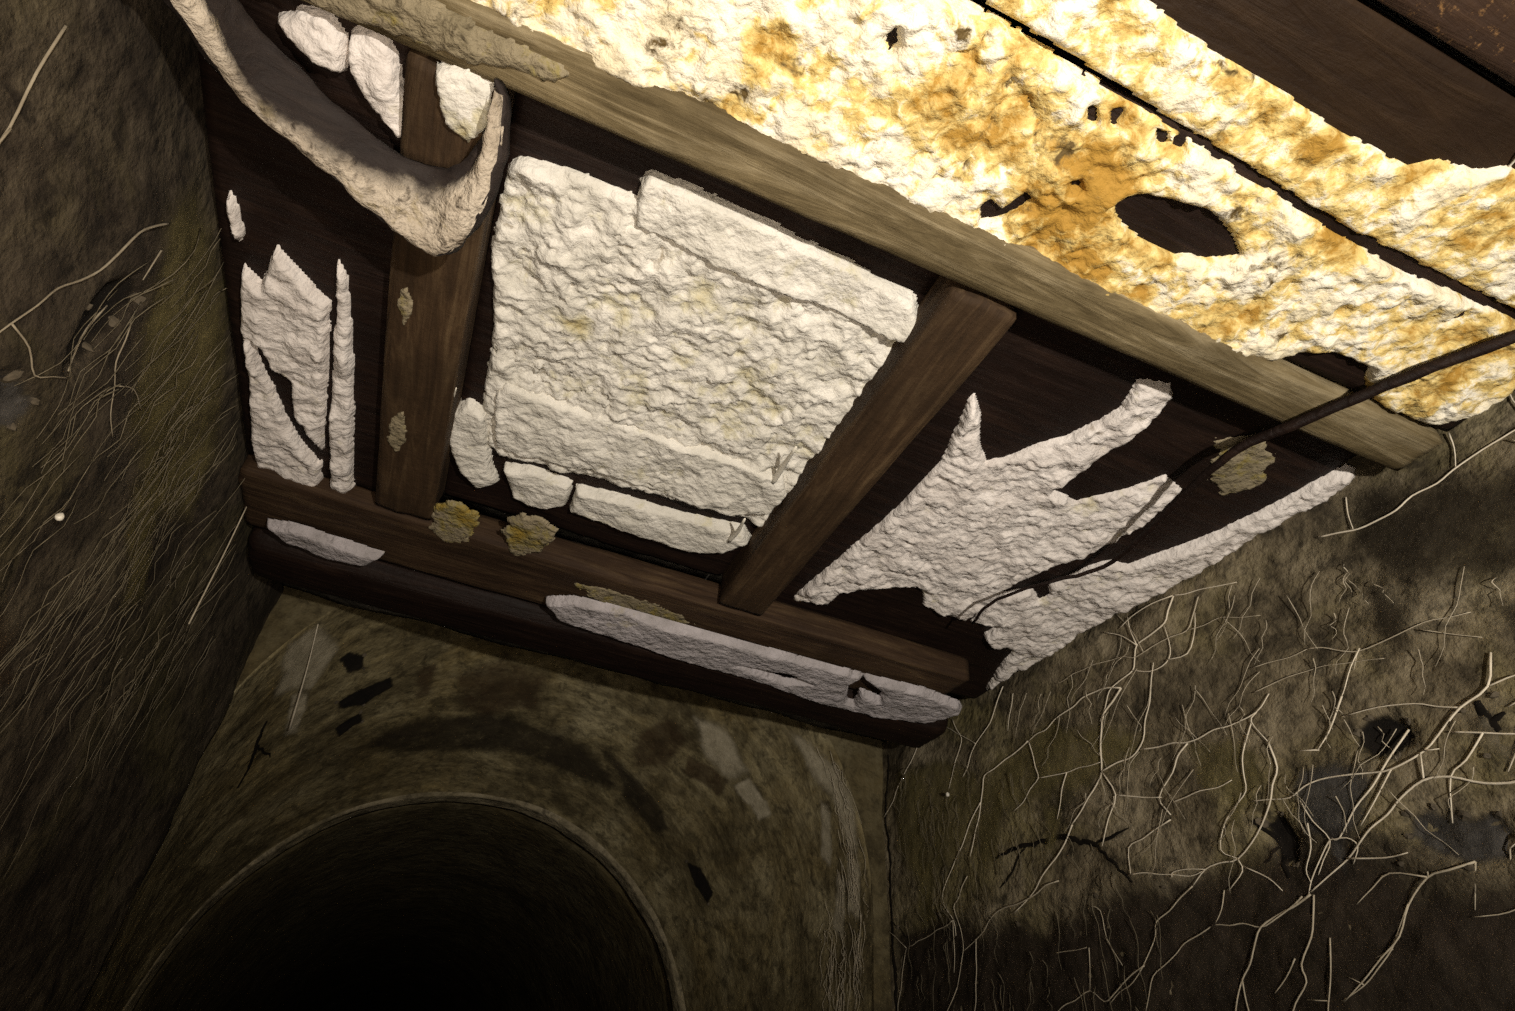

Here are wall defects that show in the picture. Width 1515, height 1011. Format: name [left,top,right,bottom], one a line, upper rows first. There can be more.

damp [1207,432,1276,496]
damp [428,500,480,544]
damp [500,512,559,556]
damp [574,583,695,625]
crack [1474,700,1506,732]
crack [995,828,1133,888]
crack [1253,820,1291,879]